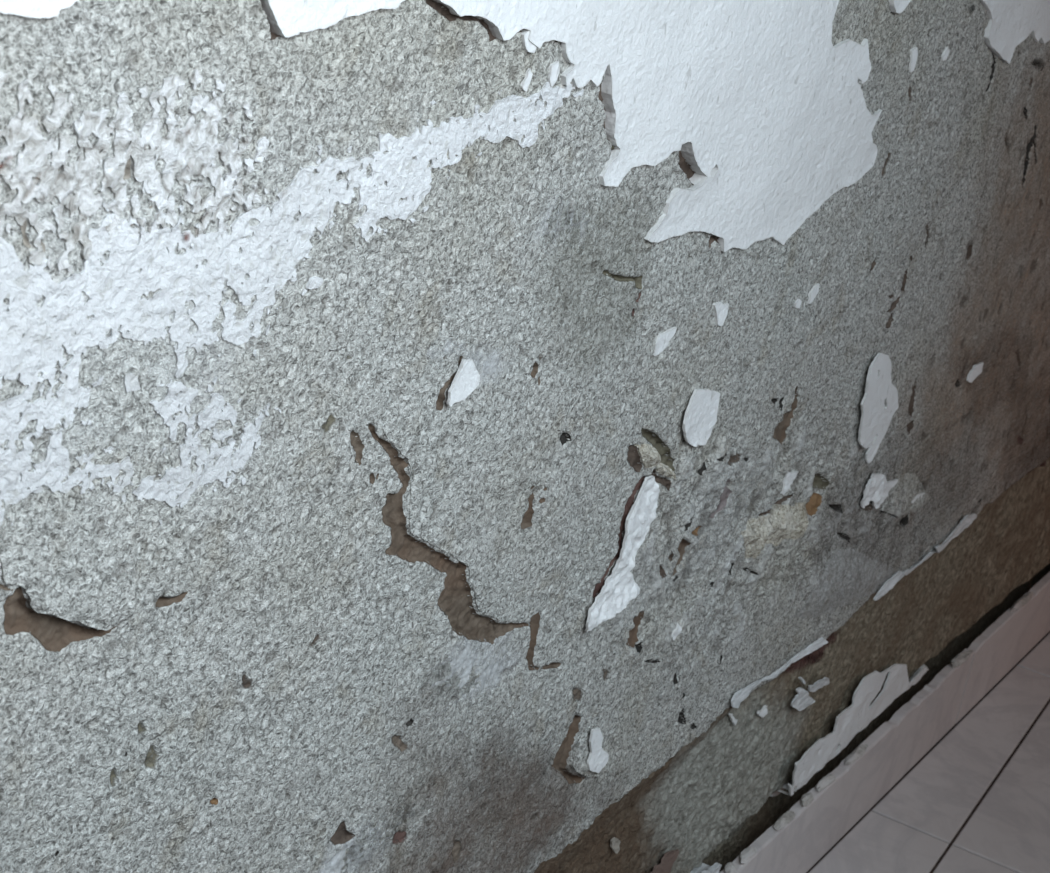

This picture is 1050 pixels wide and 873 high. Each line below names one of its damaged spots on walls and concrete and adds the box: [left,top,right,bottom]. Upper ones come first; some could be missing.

peeling [889,0,911,14]
peeling [909,47,918,73]
peeling [979,0,1050,64]
peeling [0,0,882,529]
peeling [955,362,984,387]
peeling [858,352,899,512]
spalling [534,429,1050,873]
spalling [391,719,414,752]
spalling [392,831,406,844]
leakage [429,779,565,873]